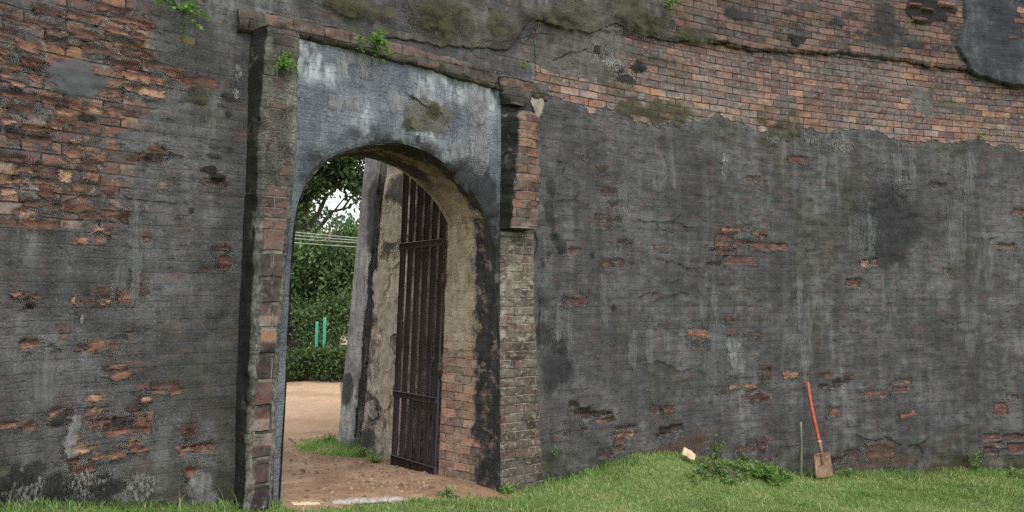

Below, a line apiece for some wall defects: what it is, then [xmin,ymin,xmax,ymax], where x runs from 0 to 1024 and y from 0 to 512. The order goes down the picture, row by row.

flaking render [0,0,221,245]
peeling [533,21,1024,152]
water stain [860,182,922,269]
peeling [0,285,184,505]
flaking render [567,400,639,460]
flaking render [970,432,1024,471]